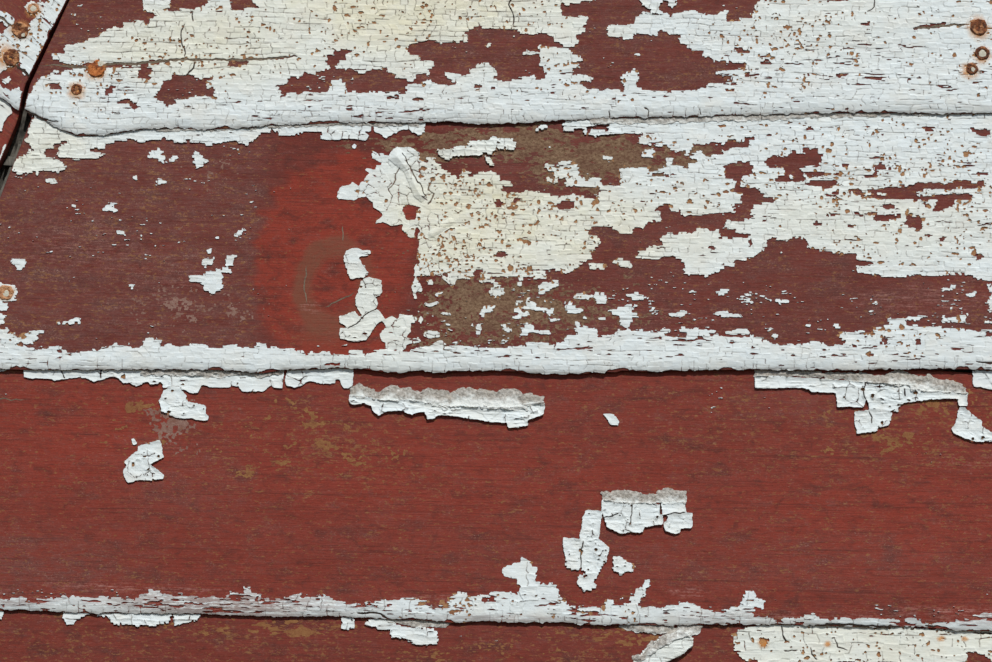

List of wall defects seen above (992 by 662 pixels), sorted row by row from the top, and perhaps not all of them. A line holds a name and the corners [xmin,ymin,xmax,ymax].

crack [16,13,297,77]
crack [914,22,992,30]
crack [388,153,435,204]
peeling [0,0,992,442]
crack [303,266,376,327]
peeling [563,499,693,592]
peeling [0,557,992,662]